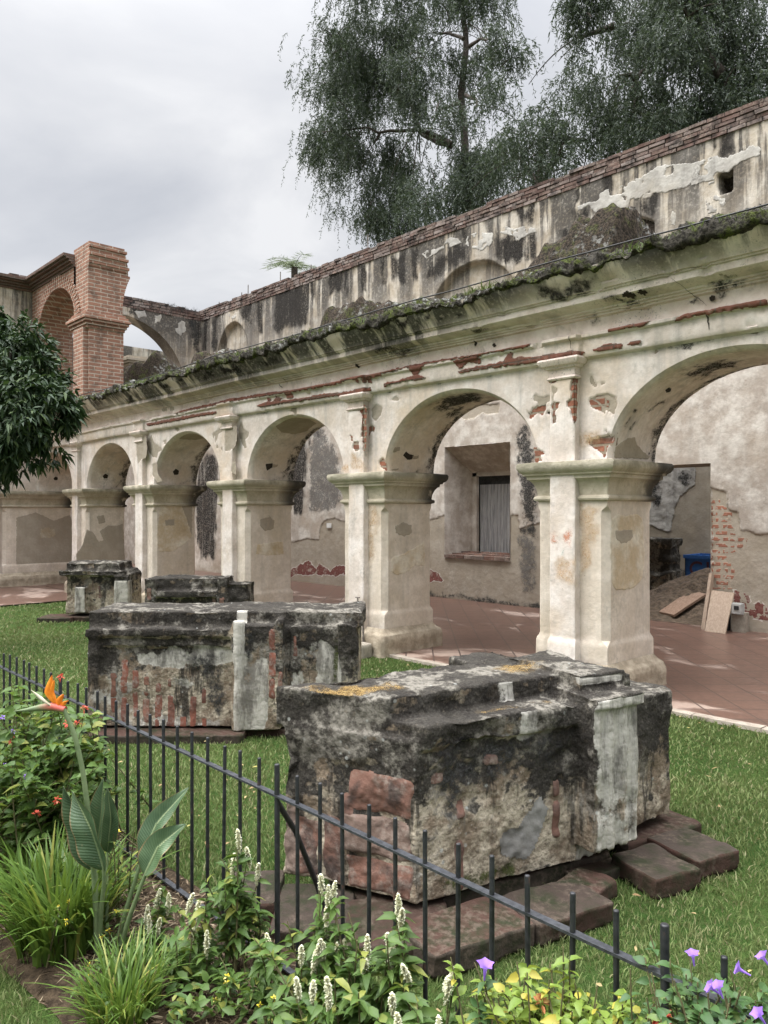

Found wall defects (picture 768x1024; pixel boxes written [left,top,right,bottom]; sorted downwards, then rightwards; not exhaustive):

peeling [577,145,761,214]
water stain [381,228,466,284]
water stain [493,203,544,264]
water stain [239,282,315,334]
flaking render [136,321,650,482]
water stain [190,443,218,560]
water stain [283,428,341,515]
water stain [517,425,537,591]
peeling [649,467,696,532]
peeling [291,518,345,587]
peeling [430,514,540,608]
peeling [711,488,768,633]